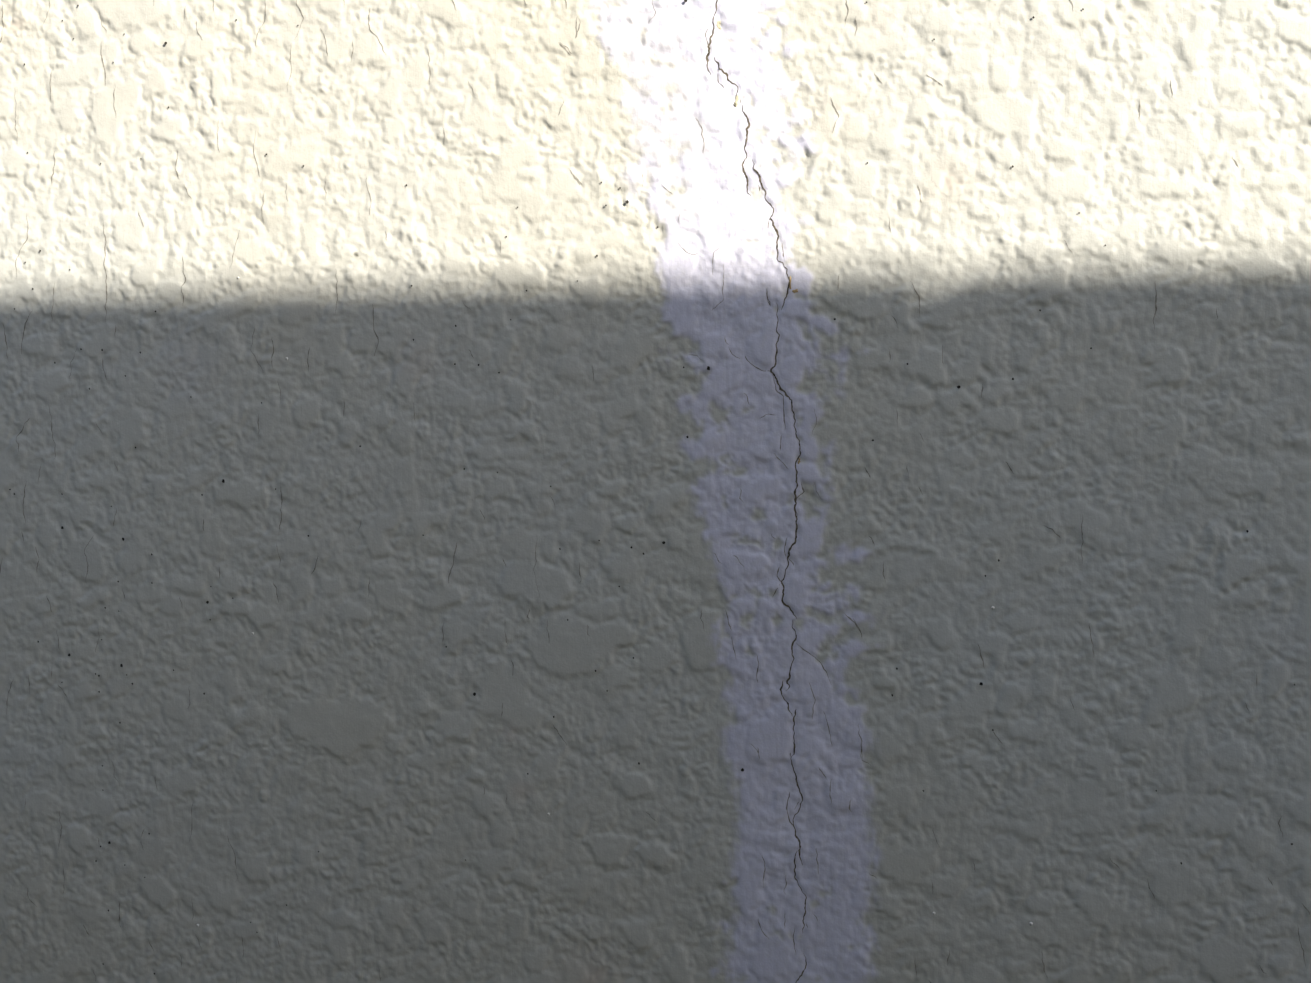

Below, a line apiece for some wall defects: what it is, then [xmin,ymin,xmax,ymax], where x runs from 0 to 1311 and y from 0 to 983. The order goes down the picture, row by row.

crack [641,171,724,310]
crack [689,0,869,982]